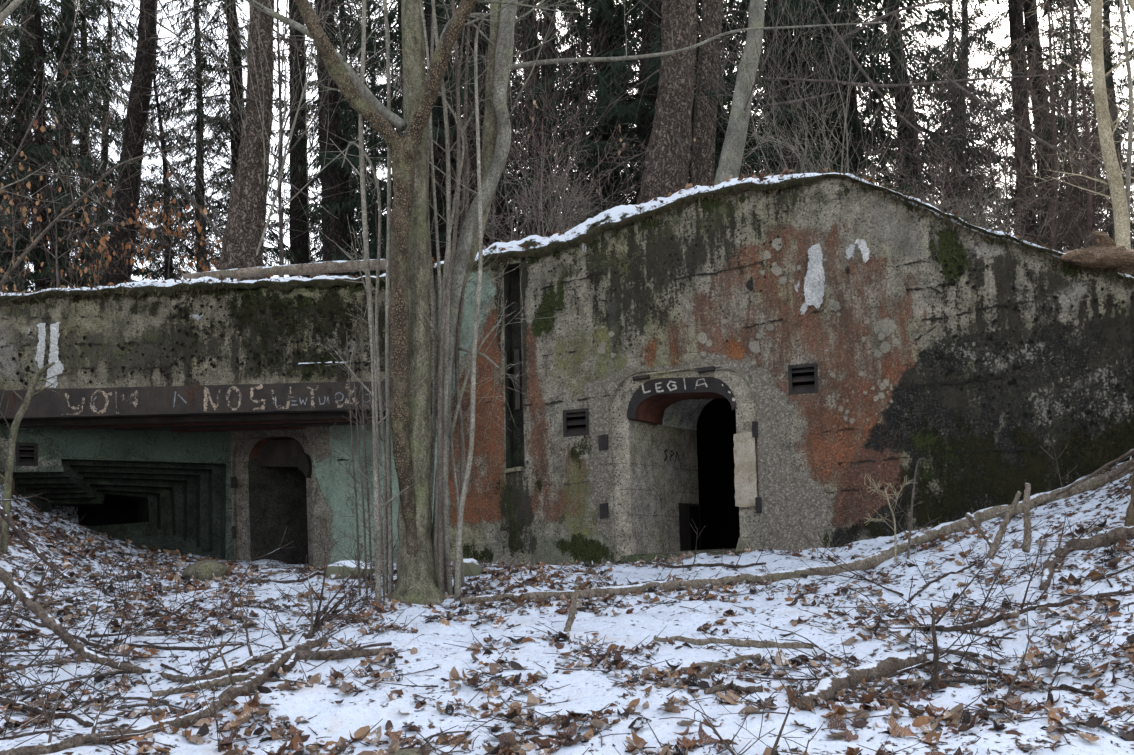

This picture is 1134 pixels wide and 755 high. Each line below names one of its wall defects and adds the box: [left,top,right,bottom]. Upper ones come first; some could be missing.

water stain [28,322,64,388]
spalling [524,203,795,358]
spalling [582,331,832,552]